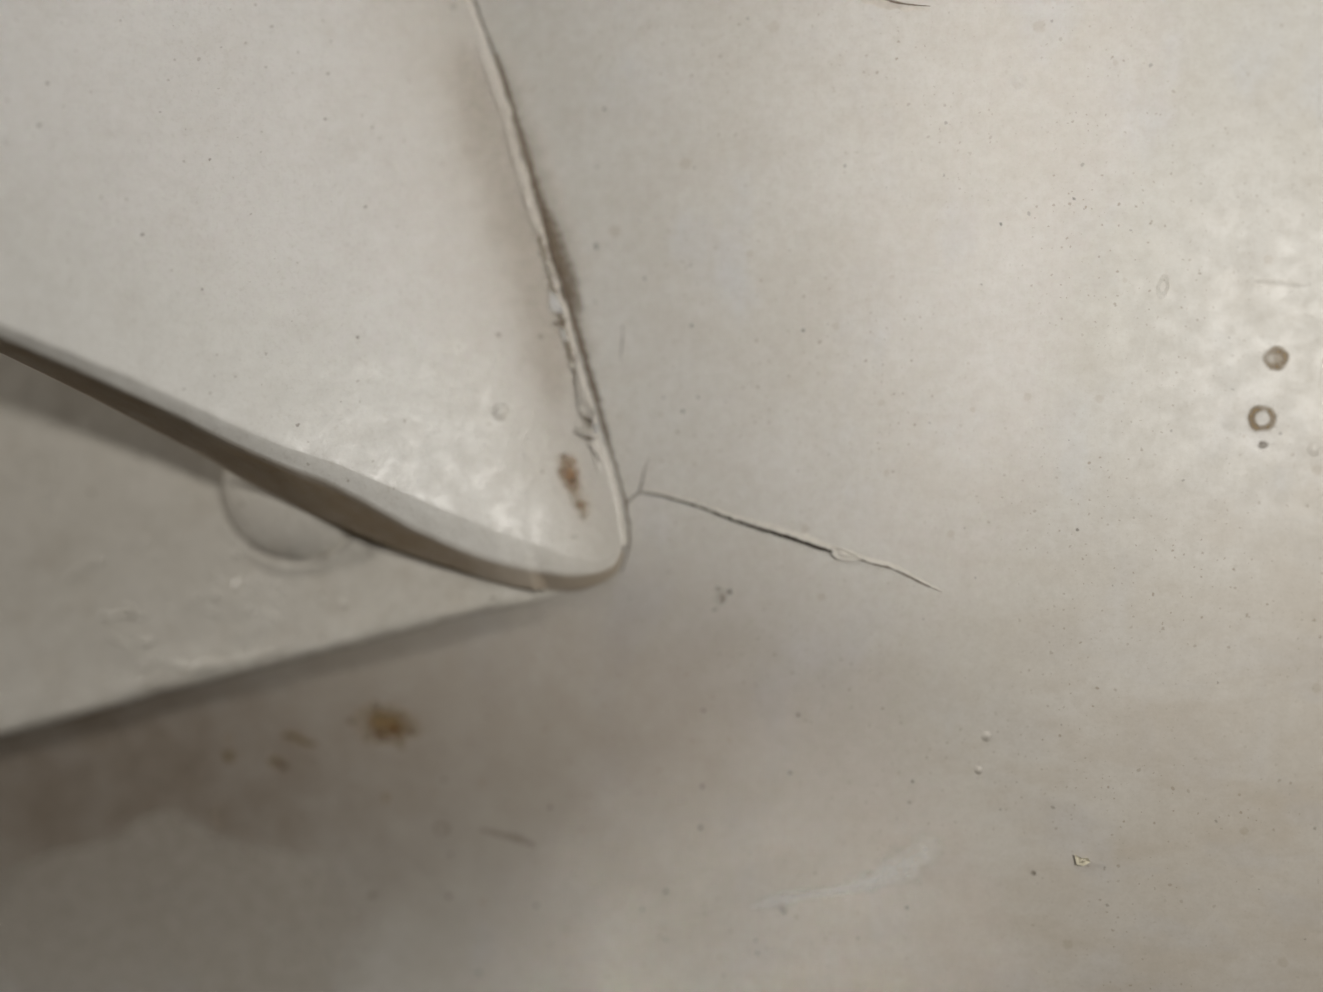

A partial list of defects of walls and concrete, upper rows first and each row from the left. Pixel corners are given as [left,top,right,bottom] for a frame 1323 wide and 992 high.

crack [861,0,930,12]
peeling [544,260,602,478]
leakage [1268,347,1288,369]
leakage [1249,407,1275,448]
crack [623,459,942,592]